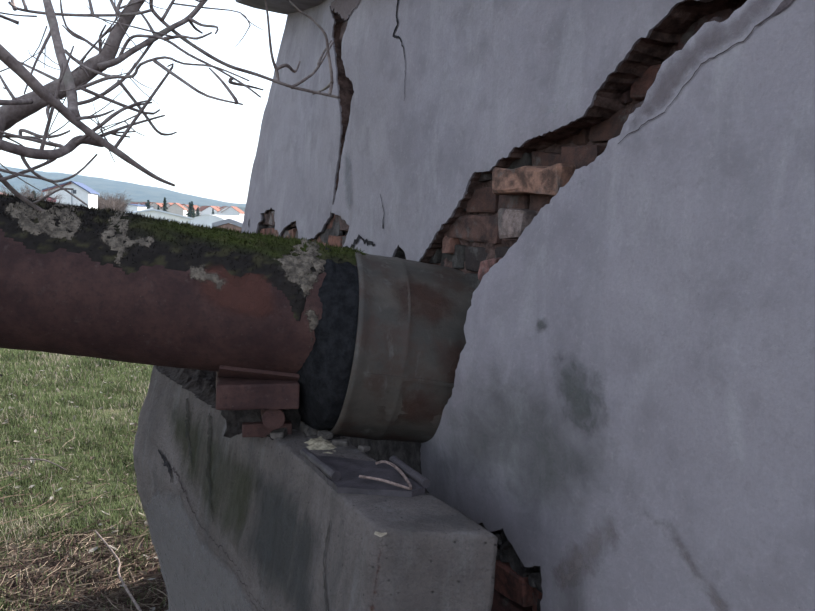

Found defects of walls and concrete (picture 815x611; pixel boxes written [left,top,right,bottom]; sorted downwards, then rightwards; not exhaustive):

crack [330,0,360,195]
crack [393,0,406,99]
corrosion [202,268,272,314]
peeling [257,202,349,297]
crack [158,449,265,611]
spalling [479,524,543,611]